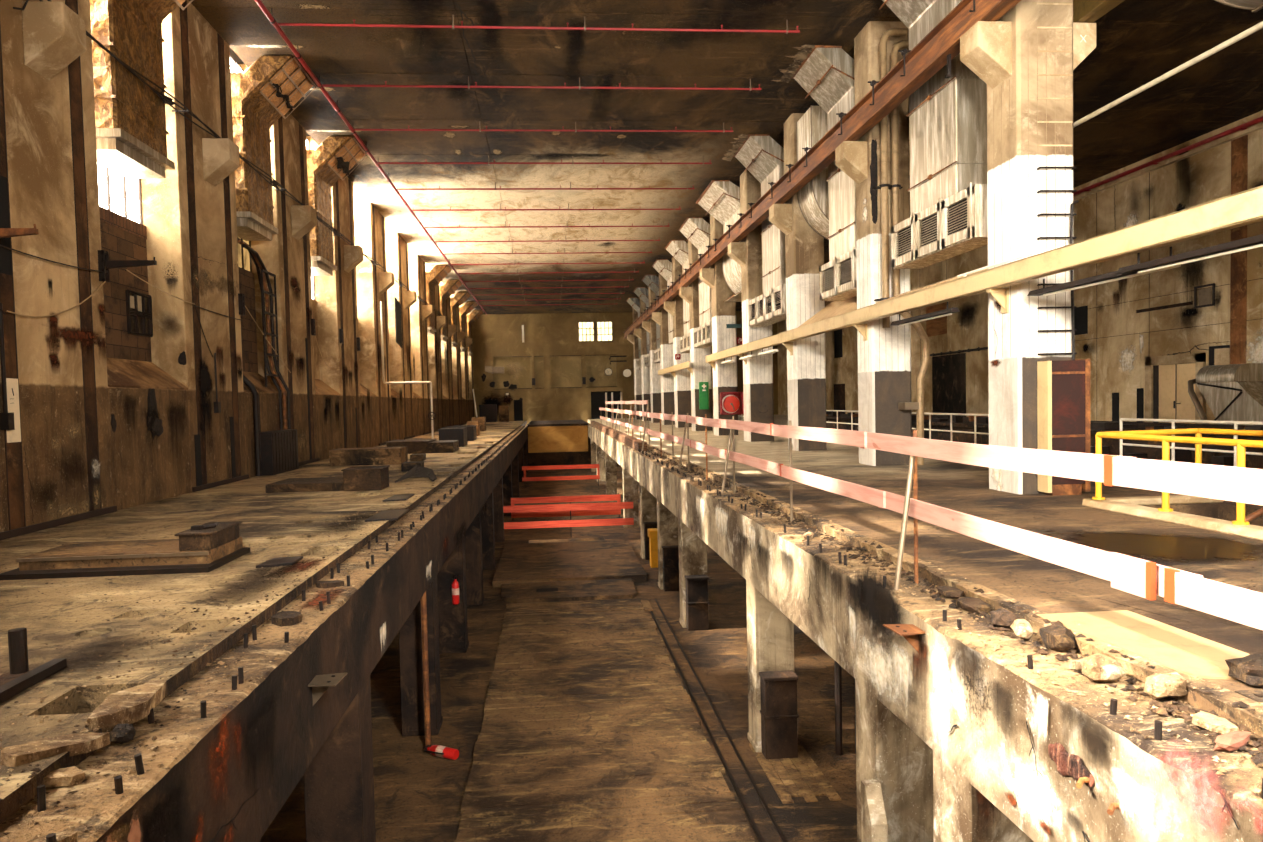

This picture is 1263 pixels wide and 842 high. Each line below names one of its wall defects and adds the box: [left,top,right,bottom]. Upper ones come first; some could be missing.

leakage [381,0,445,54]
leakage [455,1,501,55]
leakage [554,25,582,76]
leakage [592,75,643,118]
leakage [931,642,1011,743]
leakage [1037,697,1048,731]
leakage [1063,706,1109,757]
spalling [1048,743,1090,784]
leakage [1003,746,1079,833]